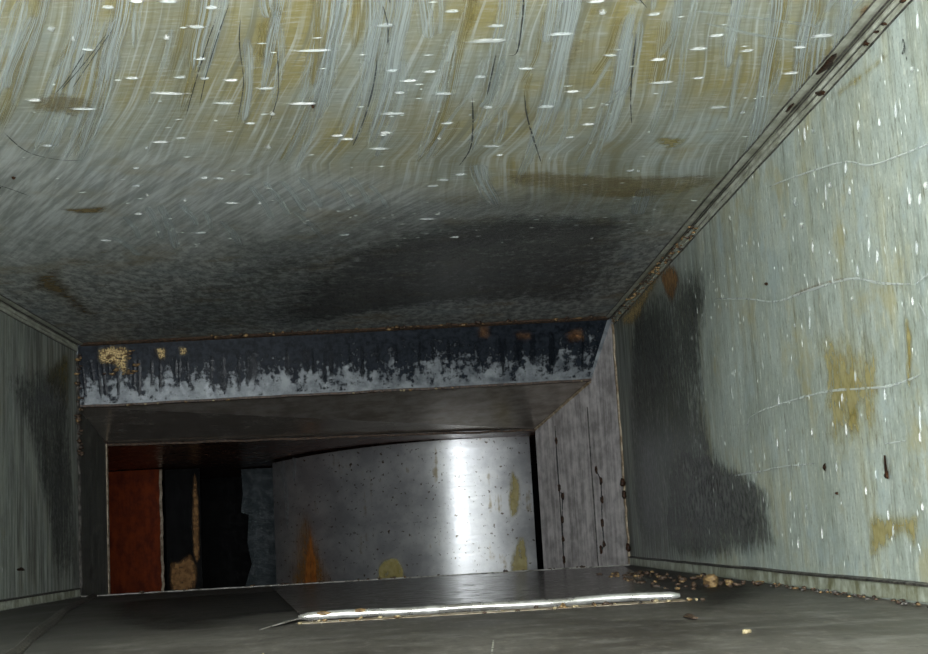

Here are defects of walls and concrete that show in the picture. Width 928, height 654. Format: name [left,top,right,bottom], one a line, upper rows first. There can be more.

corrosion [816,53,837,75]
corrosion [99,347,141,376]
water stain [826,344,875,435]
water stain [871,509,915,551]